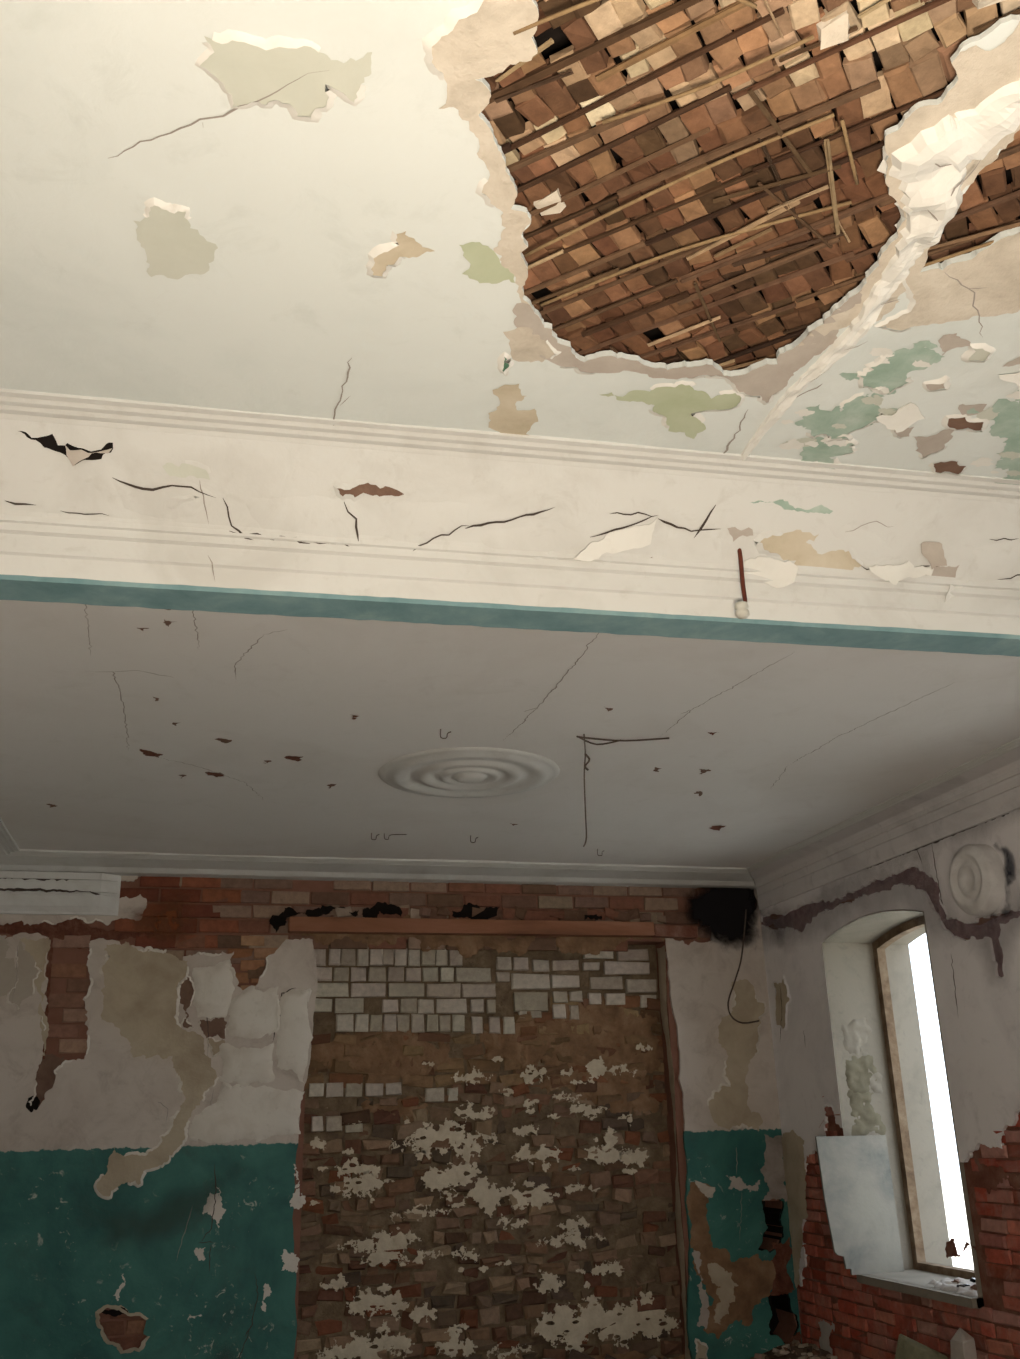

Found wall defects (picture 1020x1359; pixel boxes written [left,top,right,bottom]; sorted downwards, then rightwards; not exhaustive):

crack [110,70,329,158]
peeling [195,29,372,123]
peeling [134,197,218,280]
peeling [365,231,434,279]
flaking render [422,0,1020,492]
crack [413,507,555,551]
flaking render [574,517,658,565]
flaking render [727,527,968,602]
crack [866,811,1013,923]
flaking render [0,876,711,1200]
peeling [289,1164,306,1210]
flaking render [686,975,1020,1359]